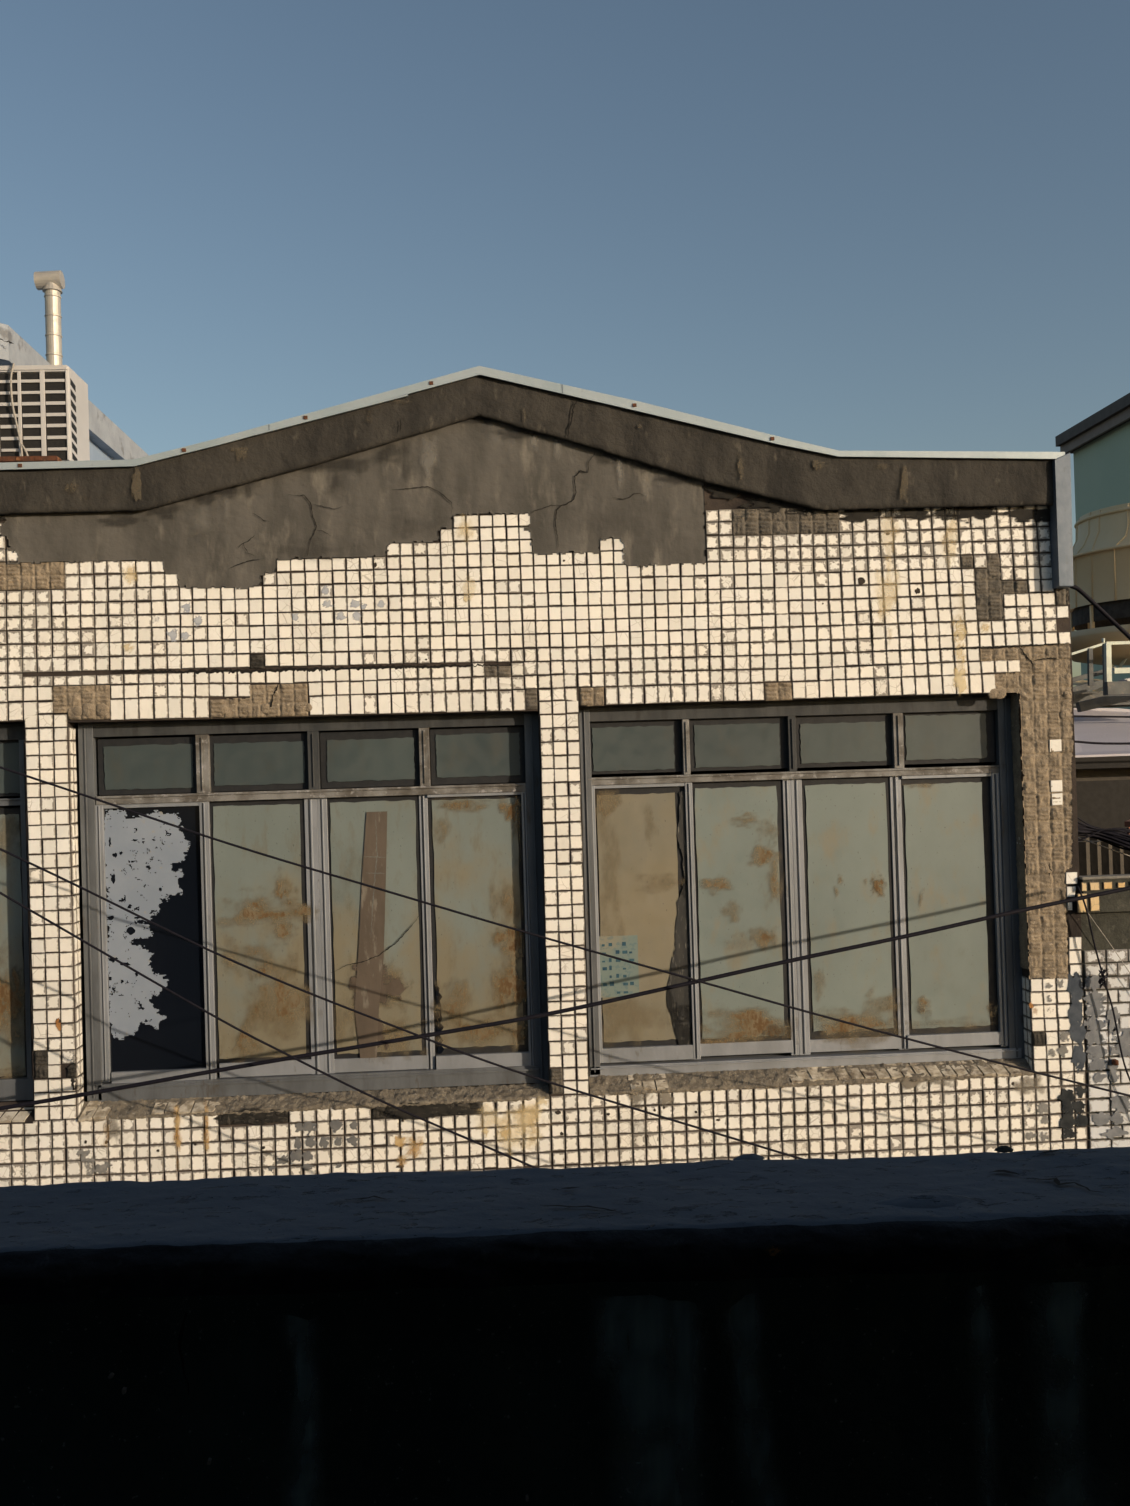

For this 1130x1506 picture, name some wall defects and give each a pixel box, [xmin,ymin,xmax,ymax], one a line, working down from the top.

crack [534,398,646,540]
crack [229,494,343,569]
peeling [0,562,66,590]
peeling [960,555,1028,621]